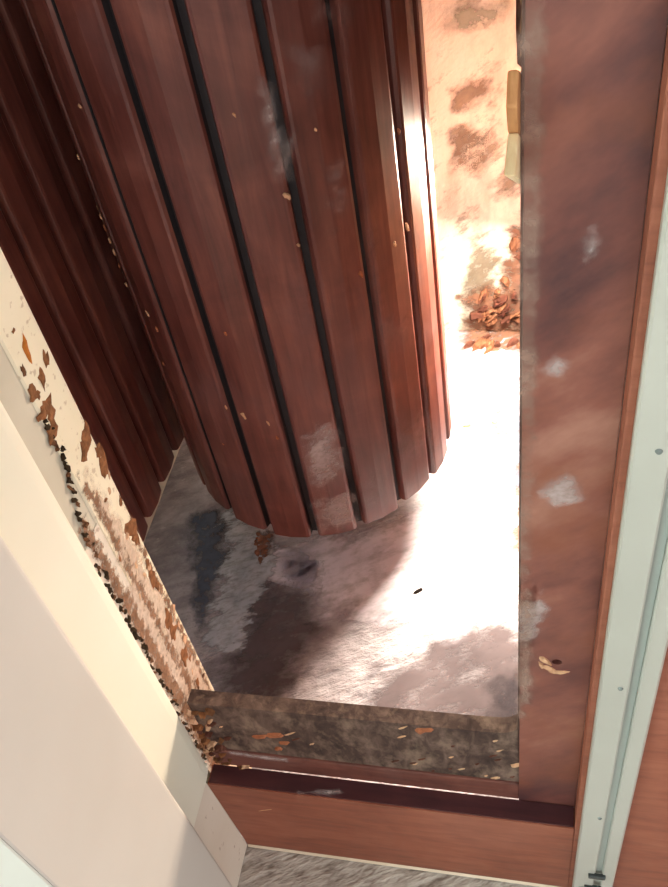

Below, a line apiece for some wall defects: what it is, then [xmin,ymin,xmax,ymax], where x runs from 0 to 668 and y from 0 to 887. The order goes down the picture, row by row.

leakage [455,6,497,29]
leakage [451,80,492,113]
leakage [450,125,498,171]
leakage [497,171,519,196]
peeling [77,470,227,766]
leakage [189,502,518,717]